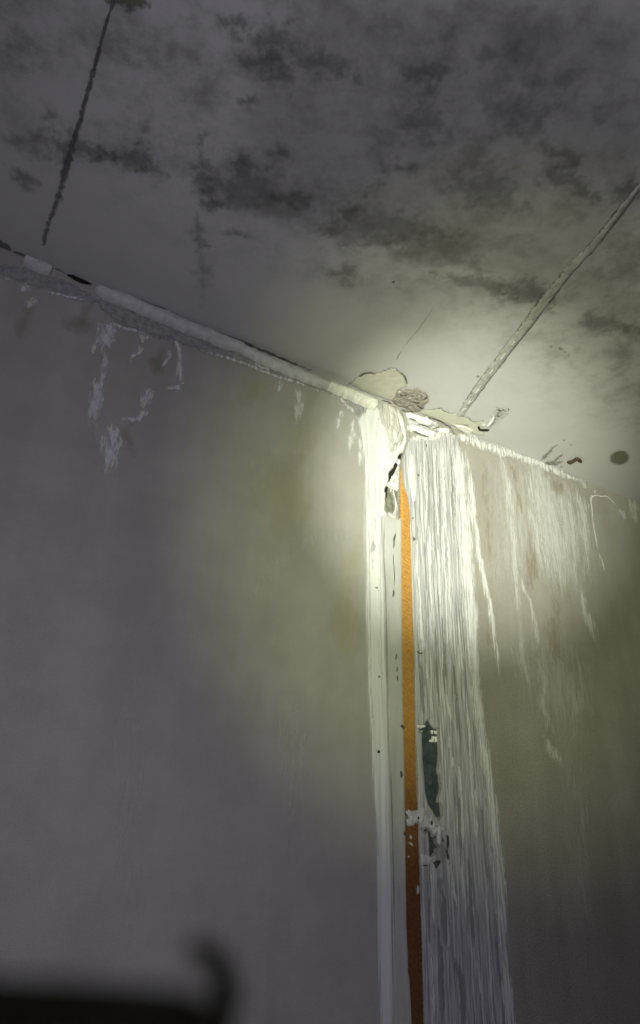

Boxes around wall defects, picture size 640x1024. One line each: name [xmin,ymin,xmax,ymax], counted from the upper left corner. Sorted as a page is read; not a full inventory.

efflorescence [88,324,116,422]
efflorescence [100,389,154,474]
peeling [351,368,495,438]
damp [336,407,639,1024]